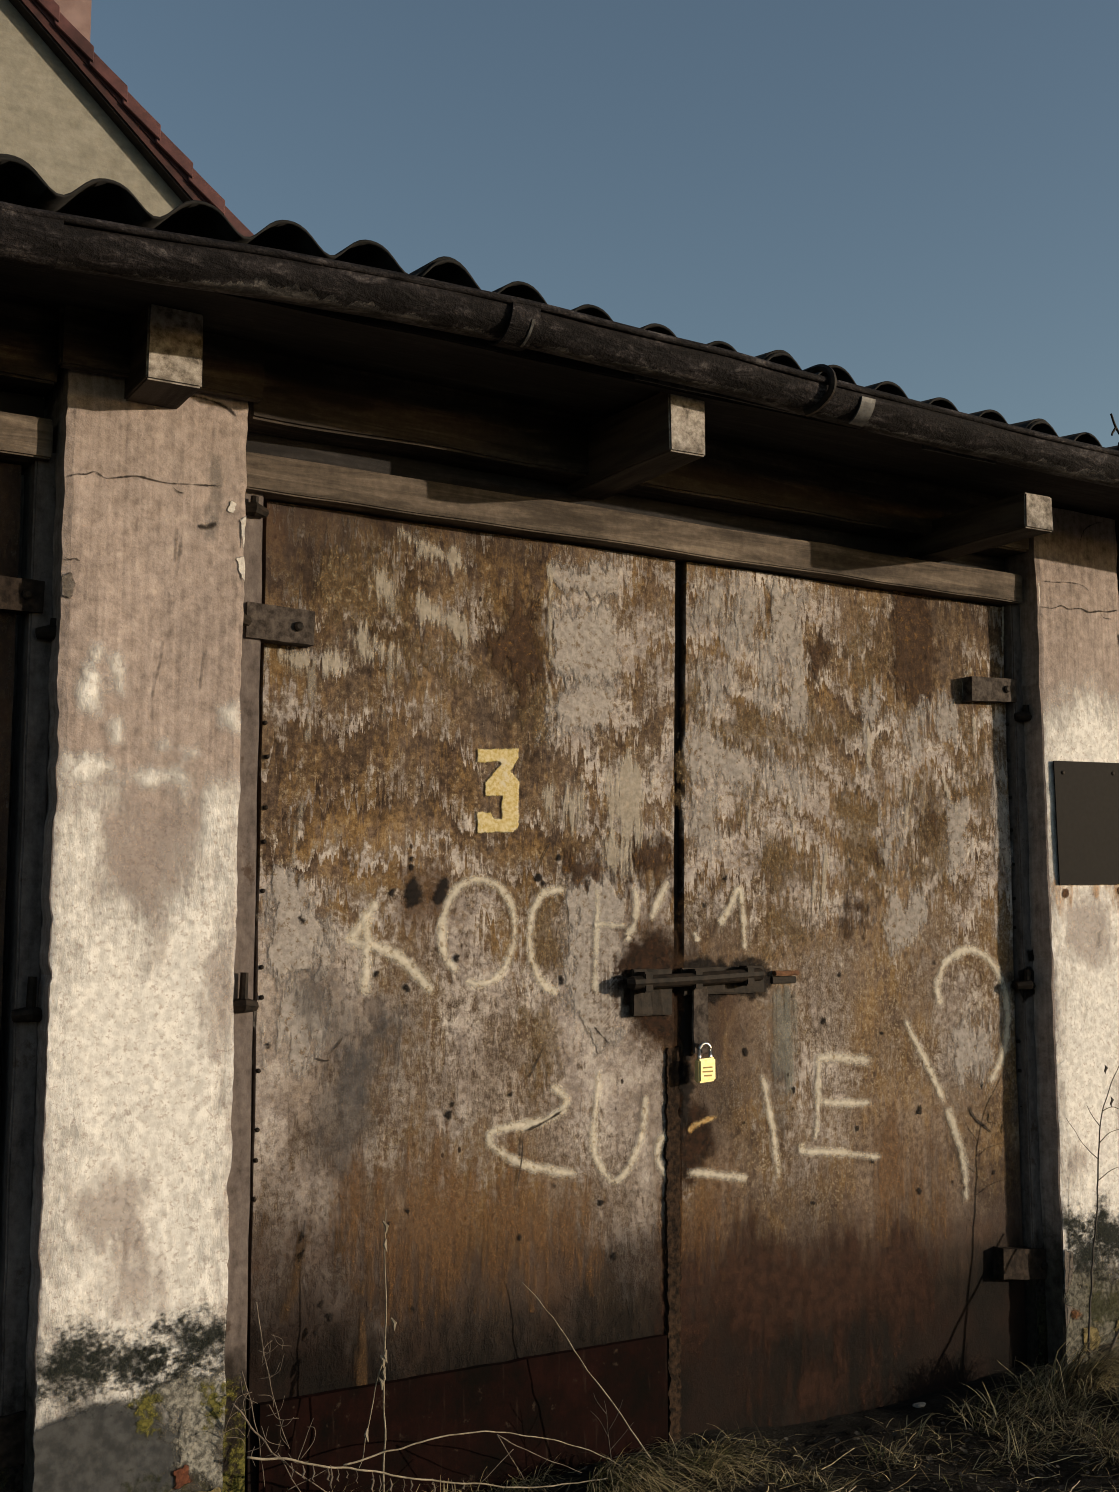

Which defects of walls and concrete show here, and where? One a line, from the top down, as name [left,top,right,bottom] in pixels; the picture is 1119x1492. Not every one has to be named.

crack [70,471,216,493]
peeling [265,622,400,675]
peeling [416,588,468,647]
peeling [536,555,627,742]
peeling [681,578,809,854]
crack [1045,581,1117,619]
peeling [559,749,653,1057]
peeling [876,804,927,957]
peeling [947,794,975,881]
damp [0,1303,247,1492]
rust [357,1317,367,1386]
damp [1036,1195,1119,1368]